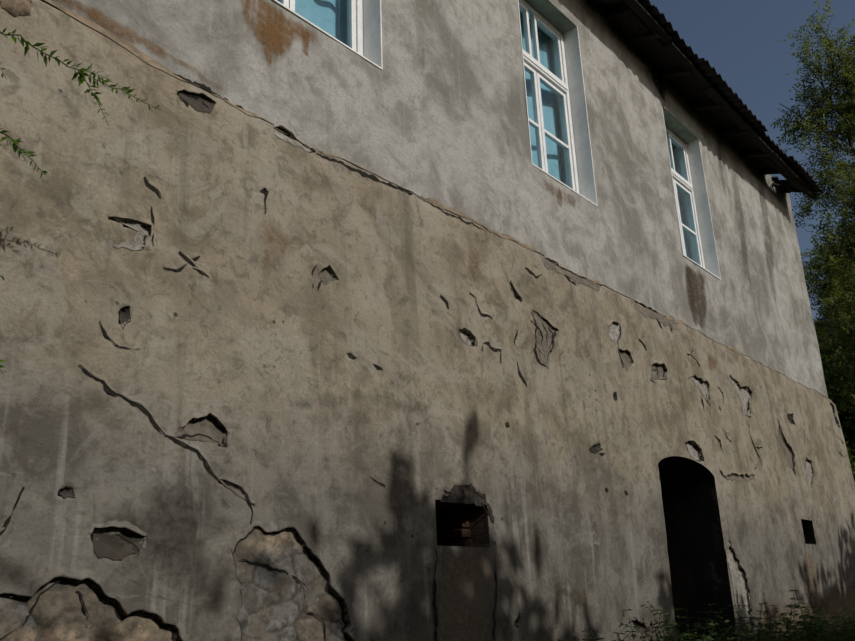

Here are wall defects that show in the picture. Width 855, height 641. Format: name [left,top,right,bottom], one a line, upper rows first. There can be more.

corrosion [245,0,310,63]
flaking render [176,87,217,113]
flaking render [108,206,155,251]
crack [163,249,210,278]
crack [440,294,450,309]
leakage [686,266,707,327]
crack [470,292,528,386]
crack [78,361,219,480]
flaking render [172,406,232,447]
crack [247,502,256,525]
flaking render [0,566,194,641]
flaking render [231,520,362,641]